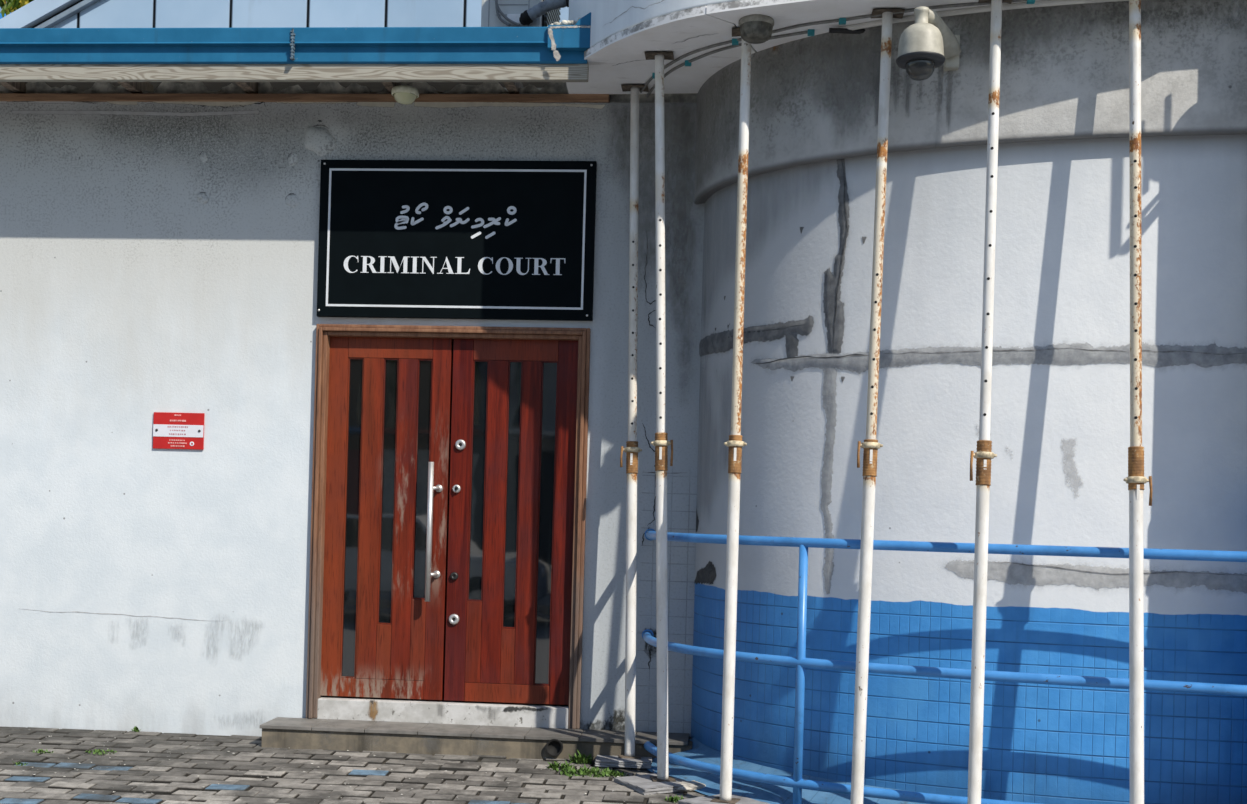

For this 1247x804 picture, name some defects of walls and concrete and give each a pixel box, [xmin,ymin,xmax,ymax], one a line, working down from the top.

crack [642,423,676,545]
peeling [694,561,716,584]